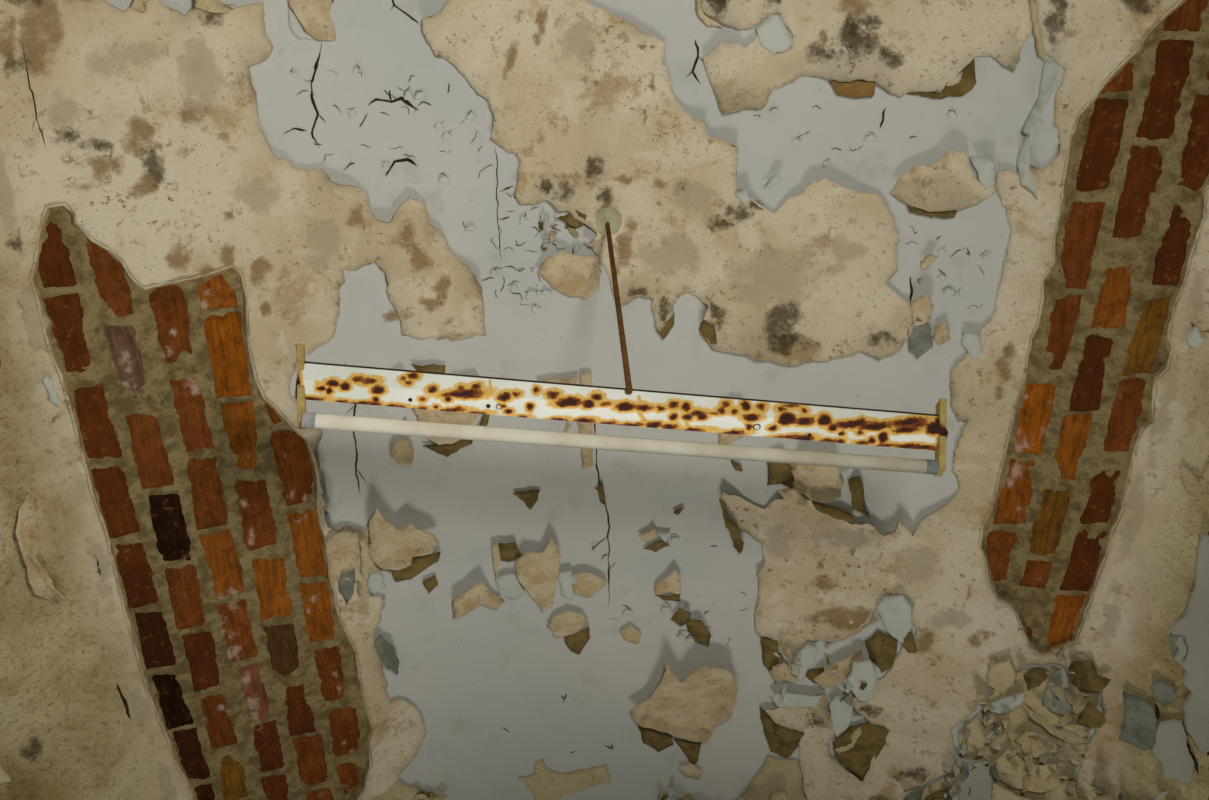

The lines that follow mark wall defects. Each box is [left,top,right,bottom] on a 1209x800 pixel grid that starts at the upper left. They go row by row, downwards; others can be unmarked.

crack [391,0,420,25]
damp [535,11,546,44]
damp [709,0,726,13]
damp [810,0,902,68]
crack [284,44,561,315]
peeling [0,0,490,800]
peeling [422,0,1209,800]
crack [346,404,366,497]
crack [591,423,730,644]